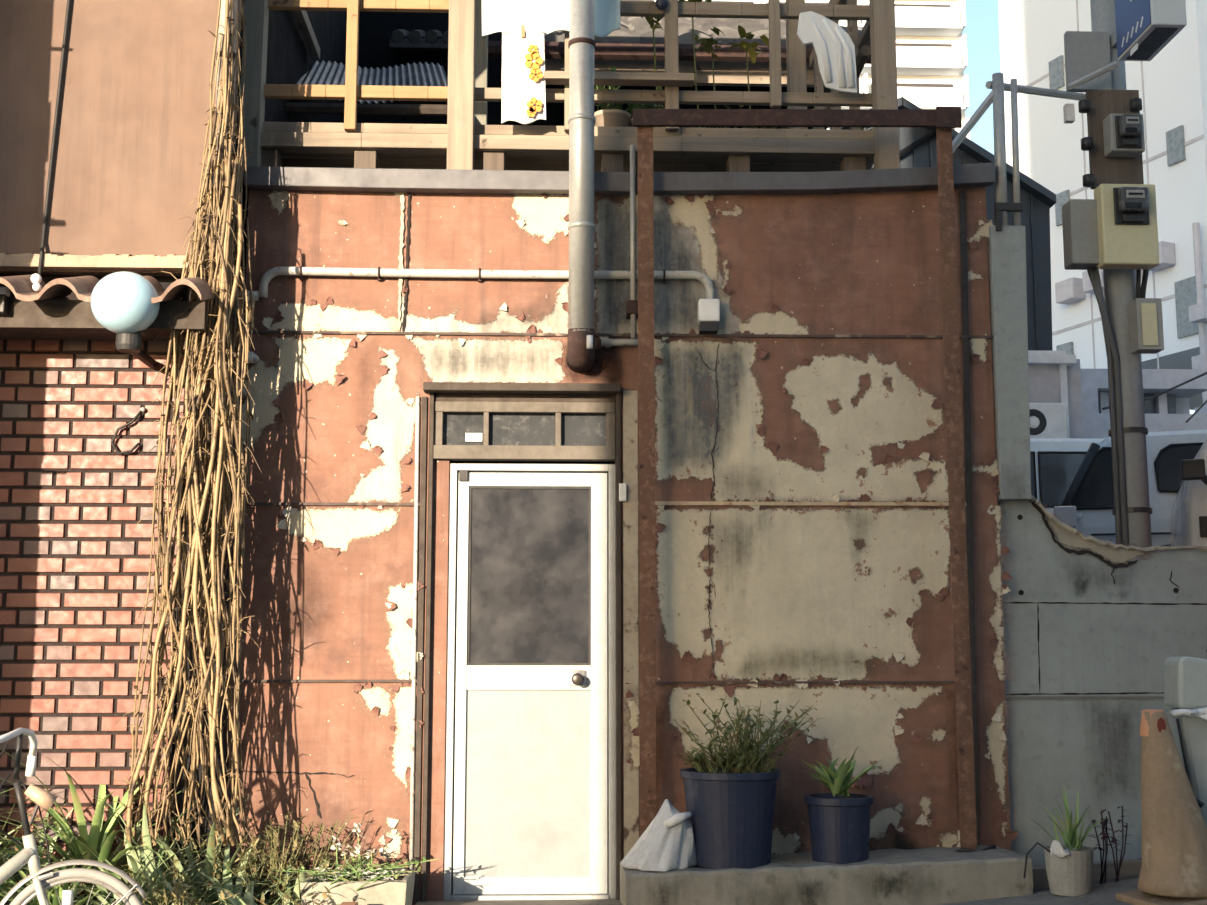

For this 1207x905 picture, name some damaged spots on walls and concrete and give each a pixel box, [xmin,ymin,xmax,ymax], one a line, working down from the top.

peeling [511,194,569,245]
damp [607,215,638,324]
damp [654,218,698,325]
peeling [970,338,990,365]
peeling [240,282,569,556]
peeling [653,195,951,789]
peeling [964,454,1013,681]
flaking render [1030,495,1207,563]
crack [234,770,355,818]
peeling [626,690,640,772]
peeling [869,796,960,848]
peeling [984,698,1018,844]